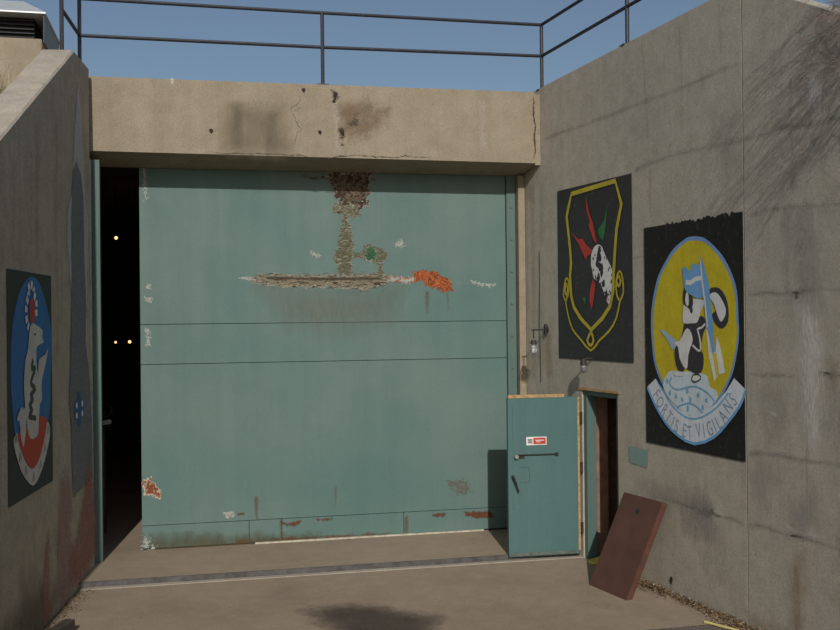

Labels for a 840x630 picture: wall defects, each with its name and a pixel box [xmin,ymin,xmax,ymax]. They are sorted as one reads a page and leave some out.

crack [530,95,538,155]
peeling [238,172,407,292]
rust [388,269,454,293]
rust [464,511,493,519]